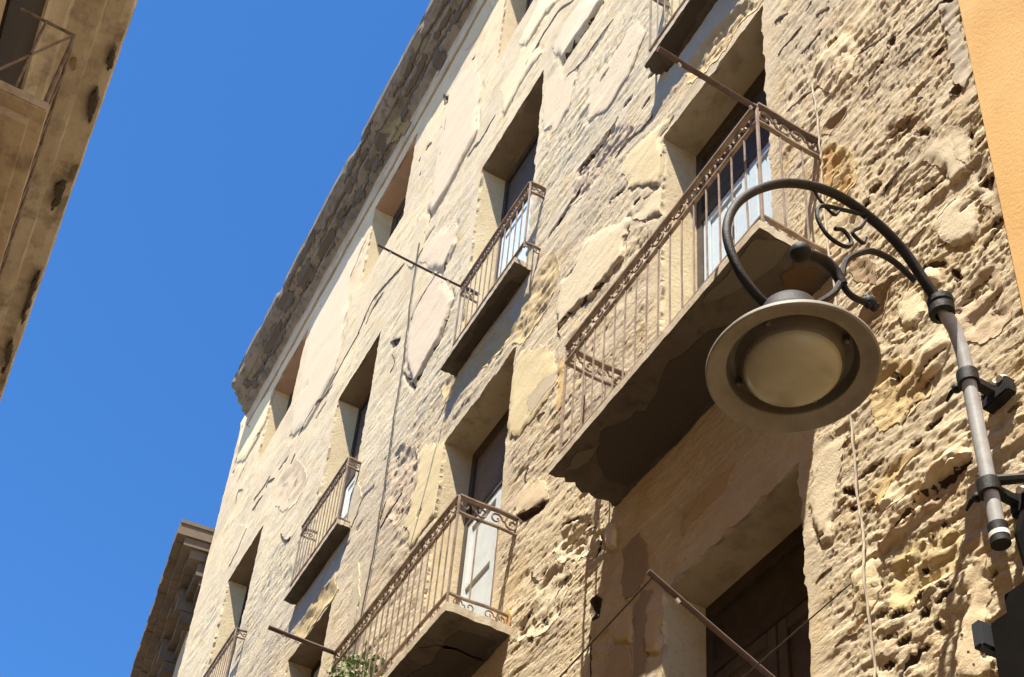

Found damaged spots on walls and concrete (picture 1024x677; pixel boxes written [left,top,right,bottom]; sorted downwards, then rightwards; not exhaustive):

spalling [441,247,561,410]
spalling [295,577,339,645]